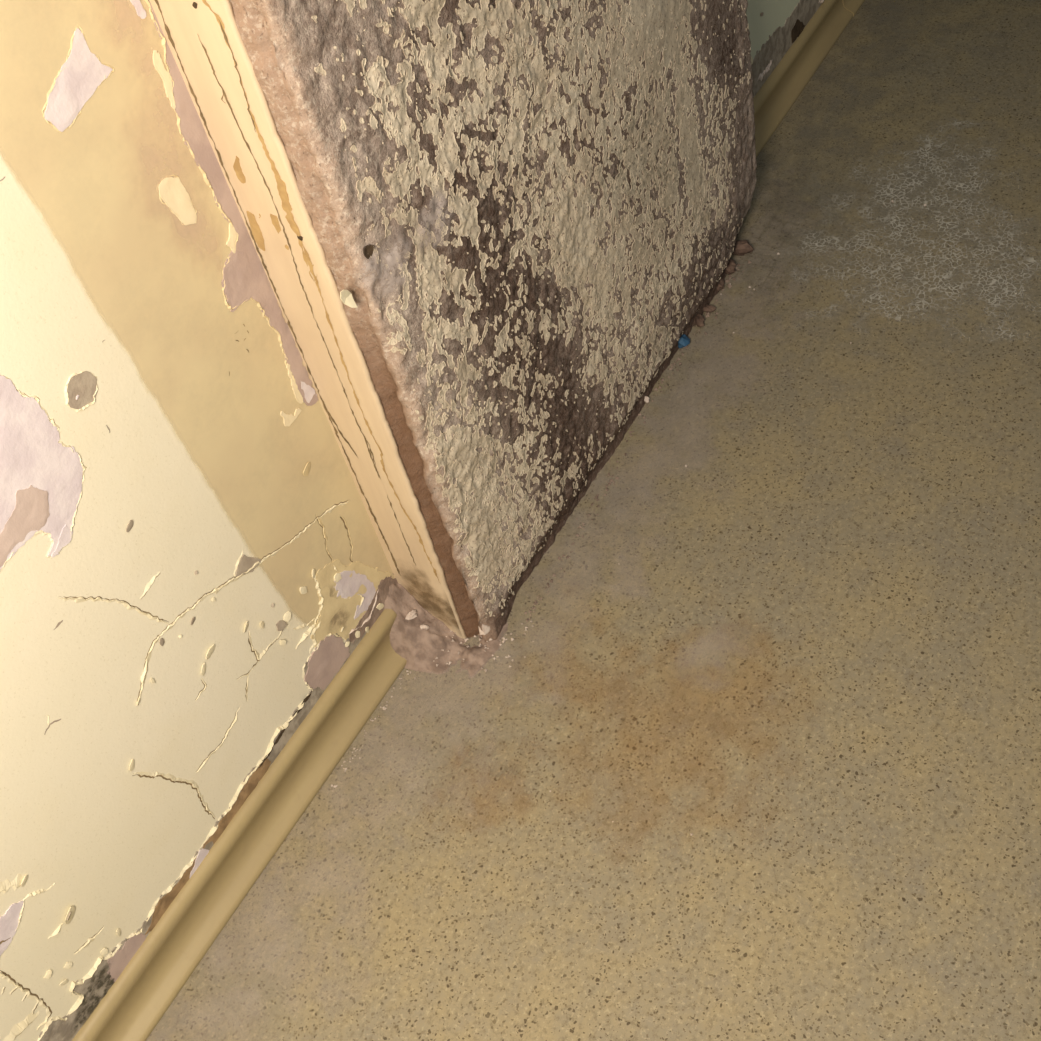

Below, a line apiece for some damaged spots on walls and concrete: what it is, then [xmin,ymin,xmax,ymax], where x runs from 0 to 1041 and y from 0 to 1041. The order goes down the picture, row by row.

peeling [42,24,114,133]
peeling [0,375,87,571]
spalling [64,371,98,412]
peeling [130,0,319,426]
crack [59,0,439,706]
water stain [363,238,409,294]
peeling [334,0,824,618]
water stain [409,579,459,627]
crack [132,611,291,819]
peeling [37,559,398,1041]
peeling [0,874,55,956]